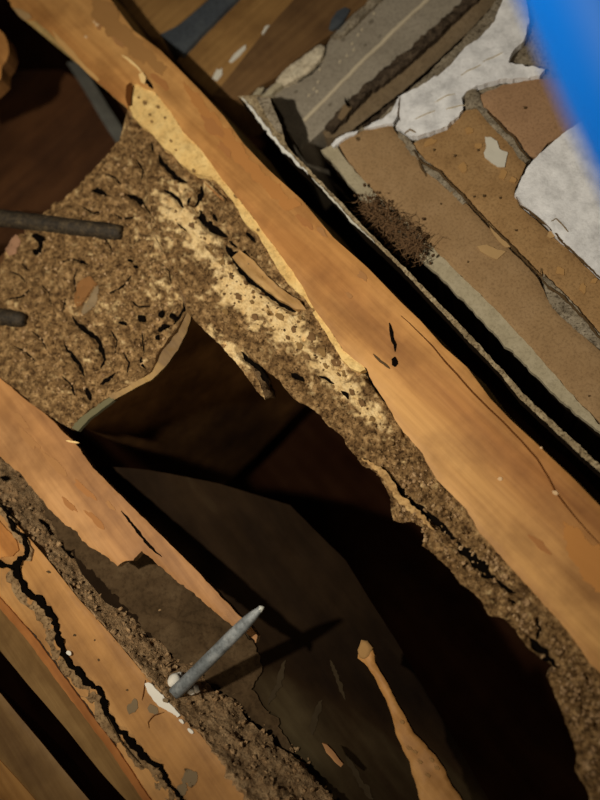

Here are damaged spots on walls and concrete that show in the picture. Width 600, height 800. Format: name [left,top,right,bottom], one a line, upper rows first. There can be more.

crack [127,194,145,206]
spalling [477,221,510,260]
crack [397,97,600,339]
crack [366,316,598,542]
crack [0,506,184,800]